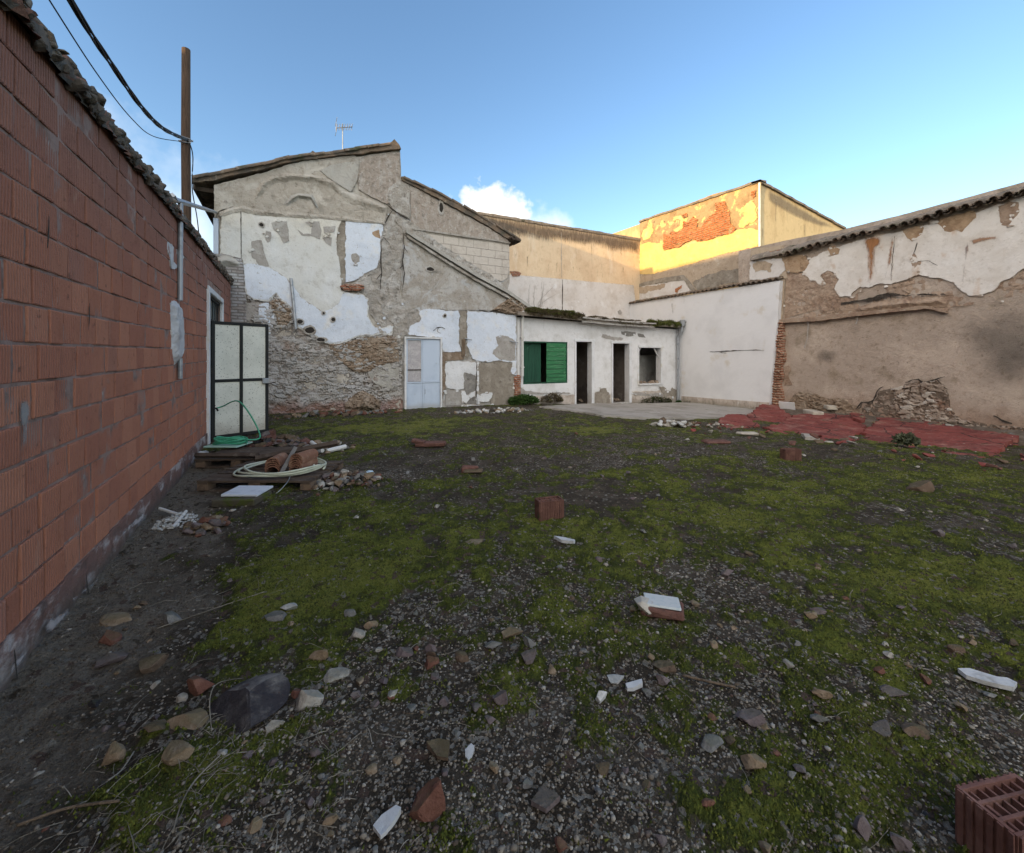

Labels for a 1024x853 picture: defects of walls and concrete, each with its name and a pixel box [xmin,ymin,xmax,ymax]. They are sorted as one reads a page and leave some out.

flaking render [640,182,761,250]
spalling [998,202,1019,227]
corrosion [865,238,893,279]
spalling [753,211,1024,323]
spalling [246,213,420,414]
spalling [459,311,469,359]
spalling [443,335,521,406]
spalling [784,366,1024,431]